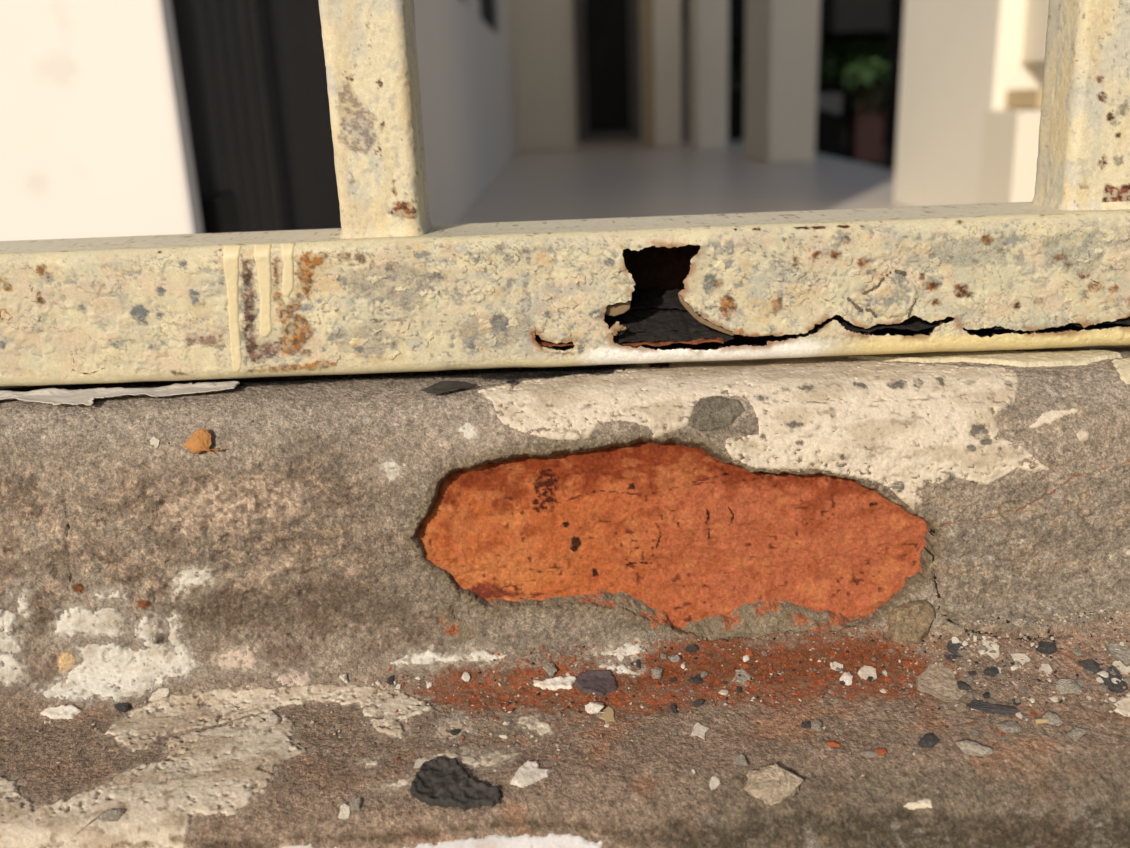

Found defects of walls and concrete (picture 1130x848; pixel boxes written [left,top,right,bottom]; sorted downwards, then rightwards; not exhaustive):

corrosion [1103,185,1130,202]
corrosion [242,252,372,372]
corrosion [720,283,736,316]
corrosion [187,336,221,345]
peeling [0,381,240,406]
spalling [390,349,1130,675]
crack [924,459,1130,640]
peeling [533,635,646,696]
peeling [0,562,554,848]
spalling [744,764,804,806]
peeling [903,798,932,810]
flaking render [403,833,602,848]